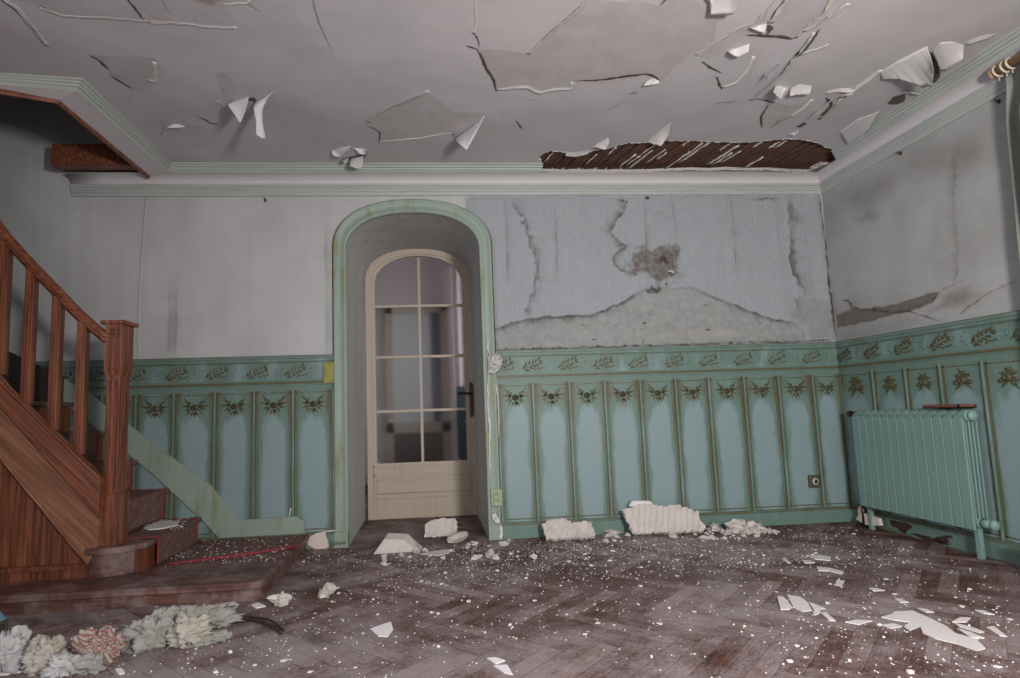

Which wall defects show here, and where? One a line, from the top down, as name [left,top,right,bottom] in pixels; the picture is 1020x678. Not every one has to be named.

peeling [217,72,276,139]
peeling [367,90,484,150]
peeling [467,0,995,172]
peeling [331,146,369,168]
damp [467,195,937,350]